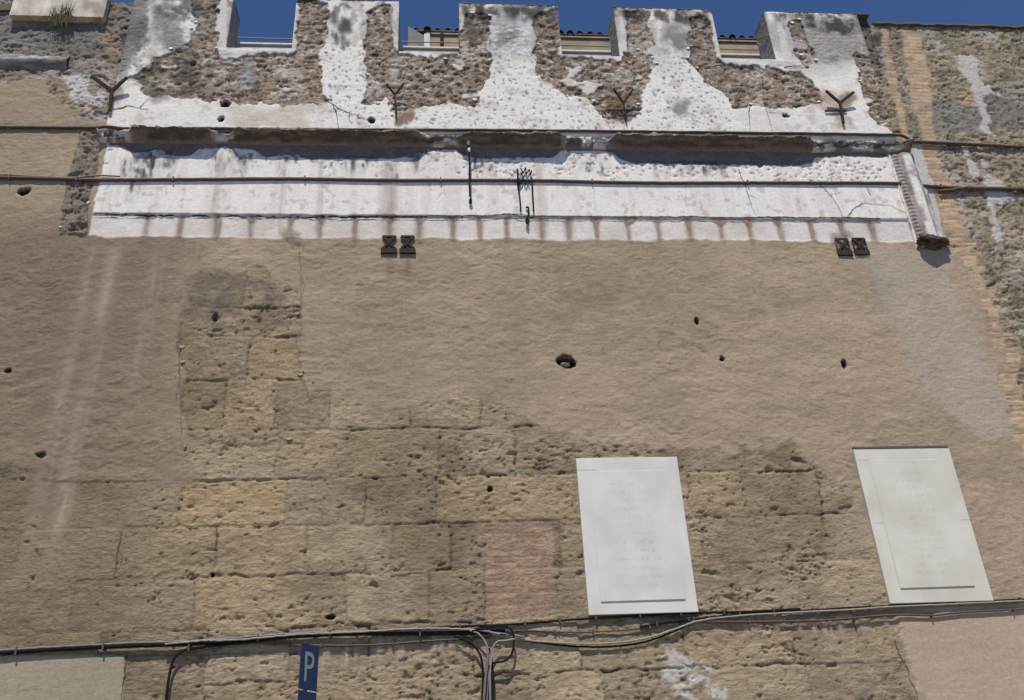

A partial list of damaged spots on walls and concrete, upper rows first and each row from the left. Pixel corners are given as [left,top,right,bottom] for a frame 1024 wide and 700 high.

flaking render [127,0,332,108]
flaking render [361,5,493,115]
flaking render [532,8,659,124]
flaking render [685,15,823,109]
flaking render [853,53,895,133]
leakage [123,152,175,190]
crack [94,169,895,230]
leakage [663,650,726,700]